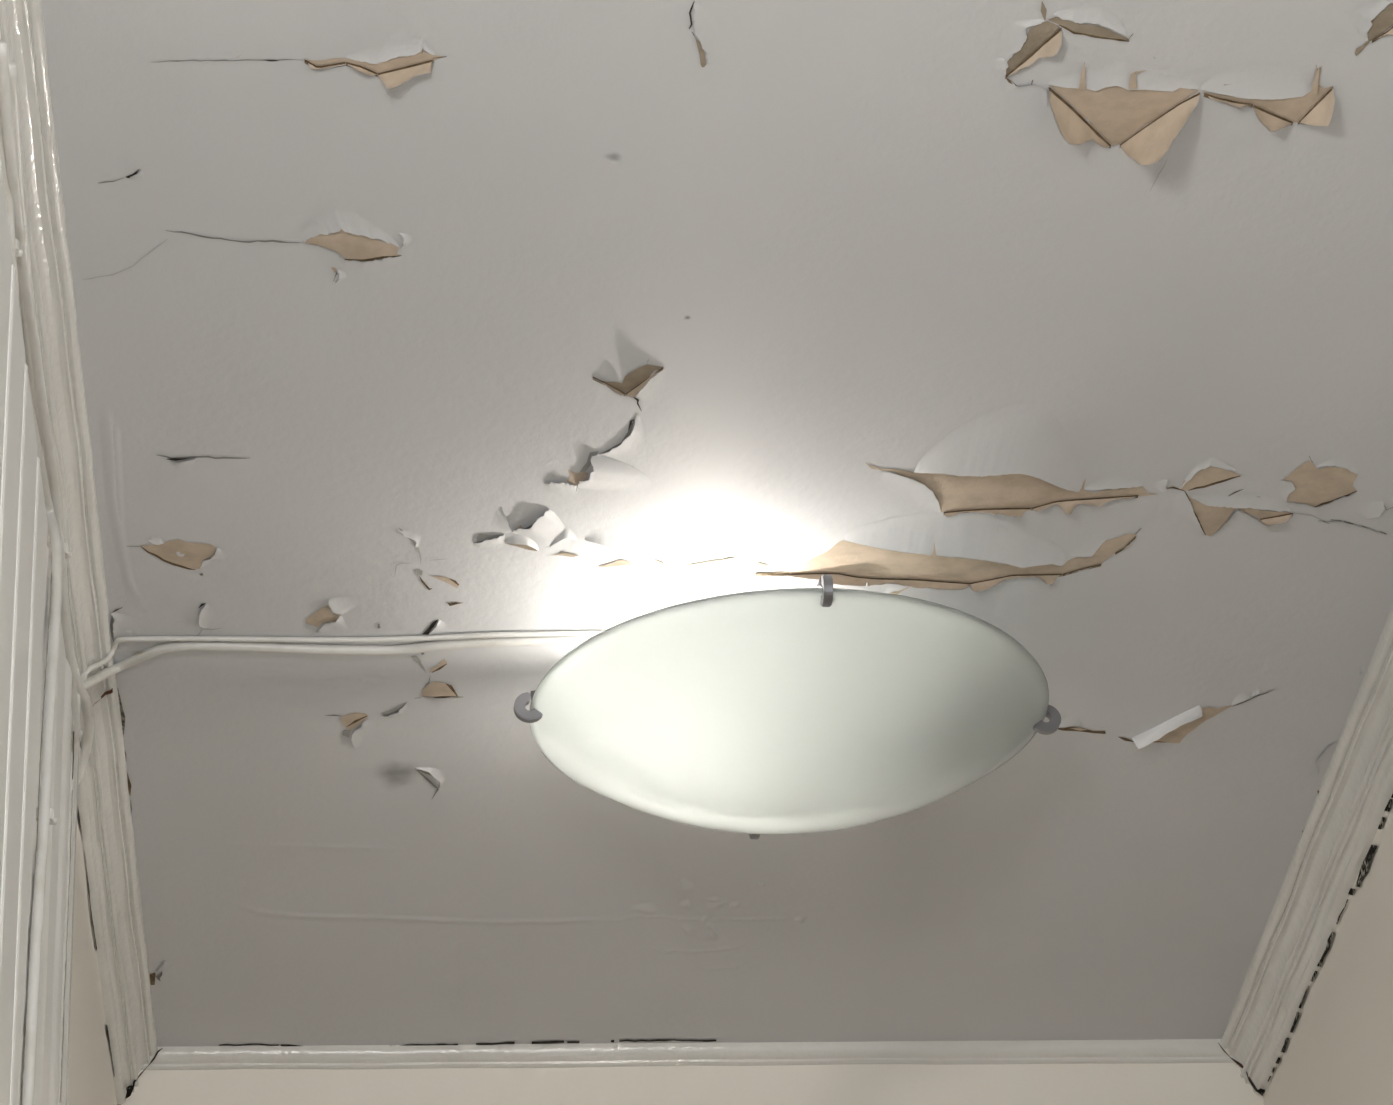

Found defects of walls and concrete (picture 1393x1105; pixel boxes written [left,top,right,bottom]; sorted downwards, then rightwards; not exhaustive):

peeling [1353,1,1393,56]
peeling [161,36,447,90]
peeling [991,1,1335,192]
peeling [88,205,414,283]
peeling [592,359,667,410]
peeling [474,403,1359,595]
peeling [127,535,227,576]
peeling [306,596,360,635]
peeling [325,653,458,748]
peeling [1119,687,1275,749]
peeling [415,766,446,800]